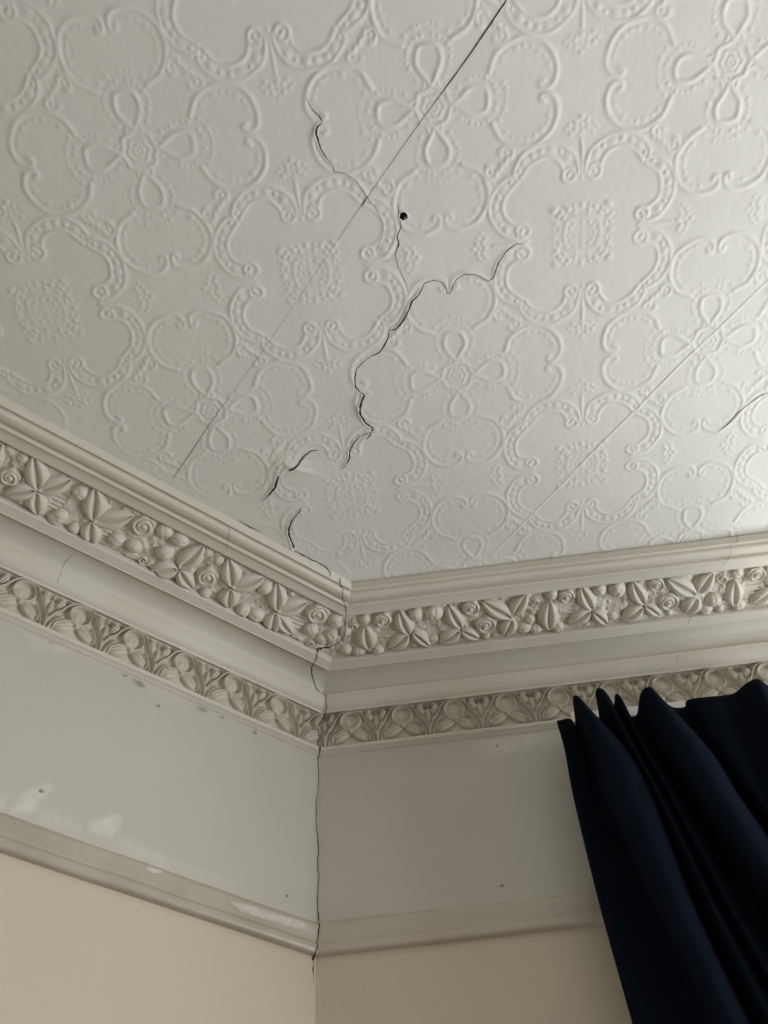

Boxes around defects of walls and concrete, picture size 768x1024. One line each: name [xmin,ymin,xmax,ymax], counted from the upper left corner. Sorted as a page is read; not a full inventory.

crack [307,100,519,469]
crack [261,450,317,500]
crack [285,508,347,982]